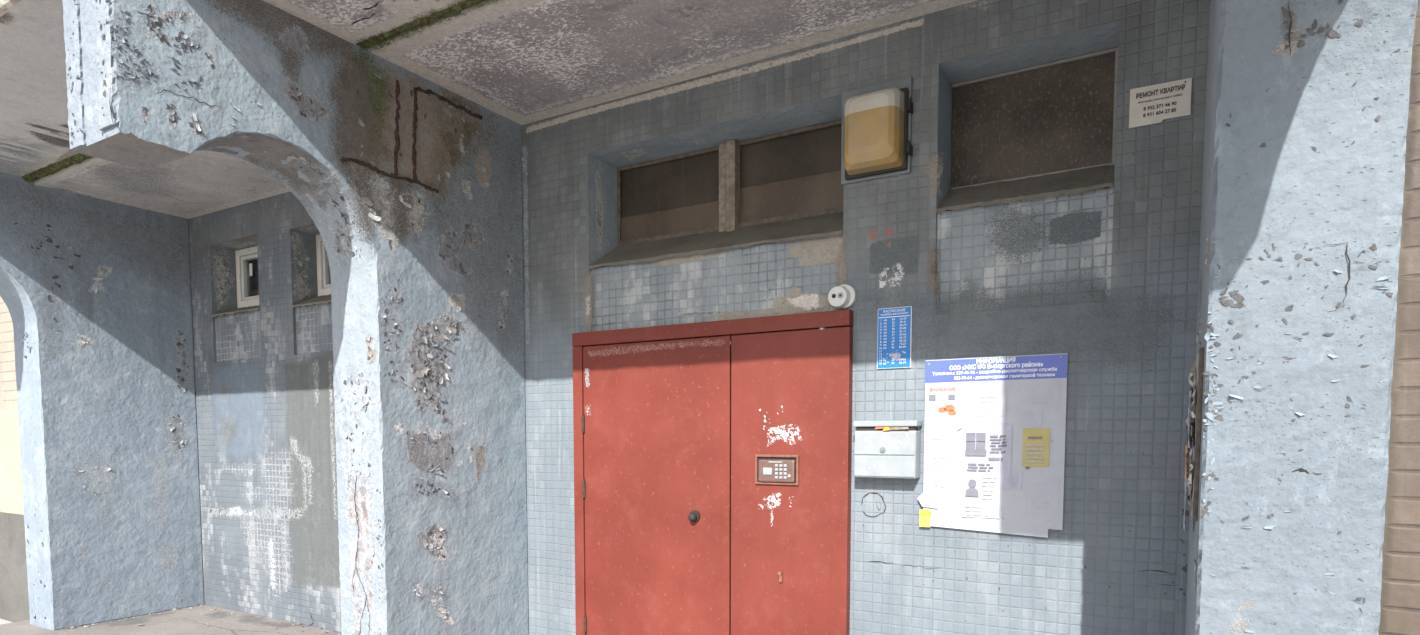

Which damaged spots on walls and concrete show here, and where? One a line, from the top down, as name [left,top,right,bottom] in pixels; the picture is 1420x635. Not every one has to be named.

spalling [1271,2,1363,61]
peeling [95,0,214,137]
damp [0,123,70,176]
damp [195,0,545,246]
crack [1335,242,1362,302]
peeling [416,520,450,562]
peeling [410,579,455,629]